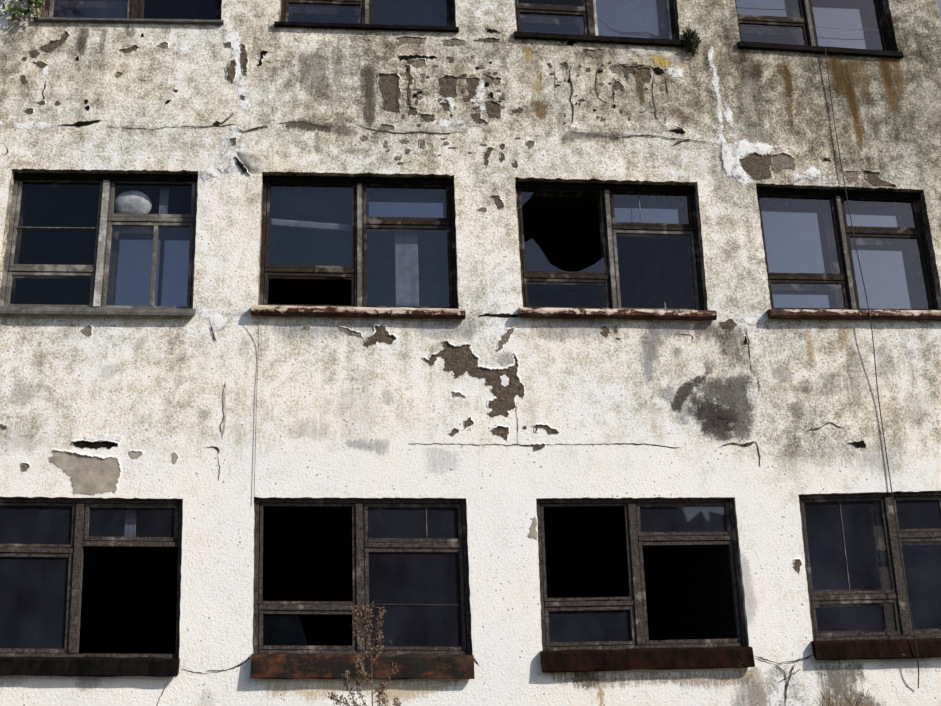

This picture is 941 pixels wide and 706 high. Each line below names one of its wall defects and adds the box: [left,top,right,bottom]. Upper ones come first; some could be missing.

crack [57,112,329,132]
spalling [361,28,525,165]
spalling [547,41,679,121]
corrosion [833,63,864,147]
corrosion [880,58,904,108]
spalling [719,139,897,188]
peeling [47,434,144,497]
crack [206,382,227,480]
peeling [422,326,526,441]
crack [414,403,679,448]
damp [671,366,754,440]
crack [718,441,761,465]